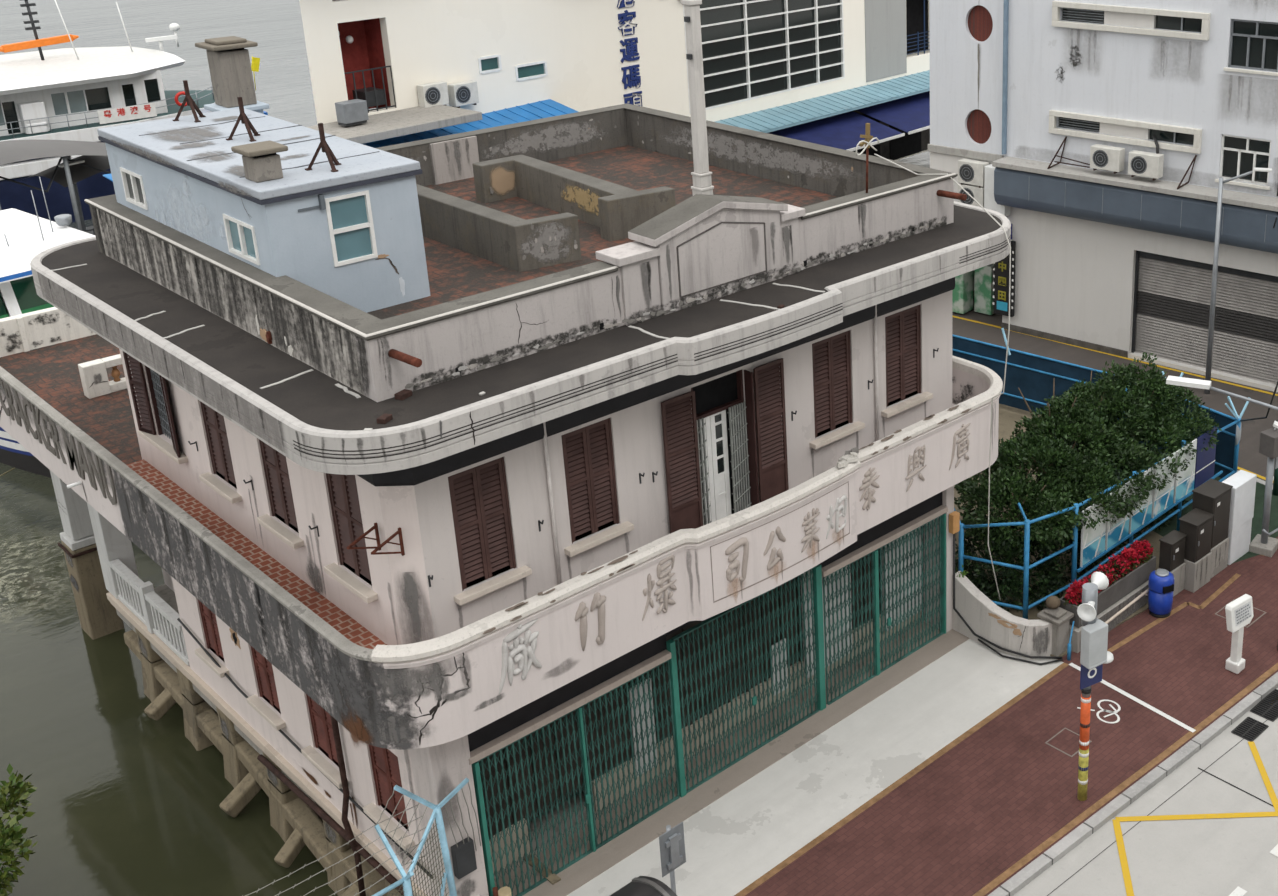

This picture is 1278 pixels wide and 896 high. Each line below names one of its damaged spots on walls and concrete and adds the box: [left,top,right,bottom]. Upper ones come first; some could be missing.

peeling [484,119,602,195]
peeling [562,186,600,216]
water stain [771,223,793,261]
water stain [858,204,866,235]
water stain [92,207,391,396]
water stain [641,263,651,310]
water stain [89,450,431,750]
crack [410,652,470,745]